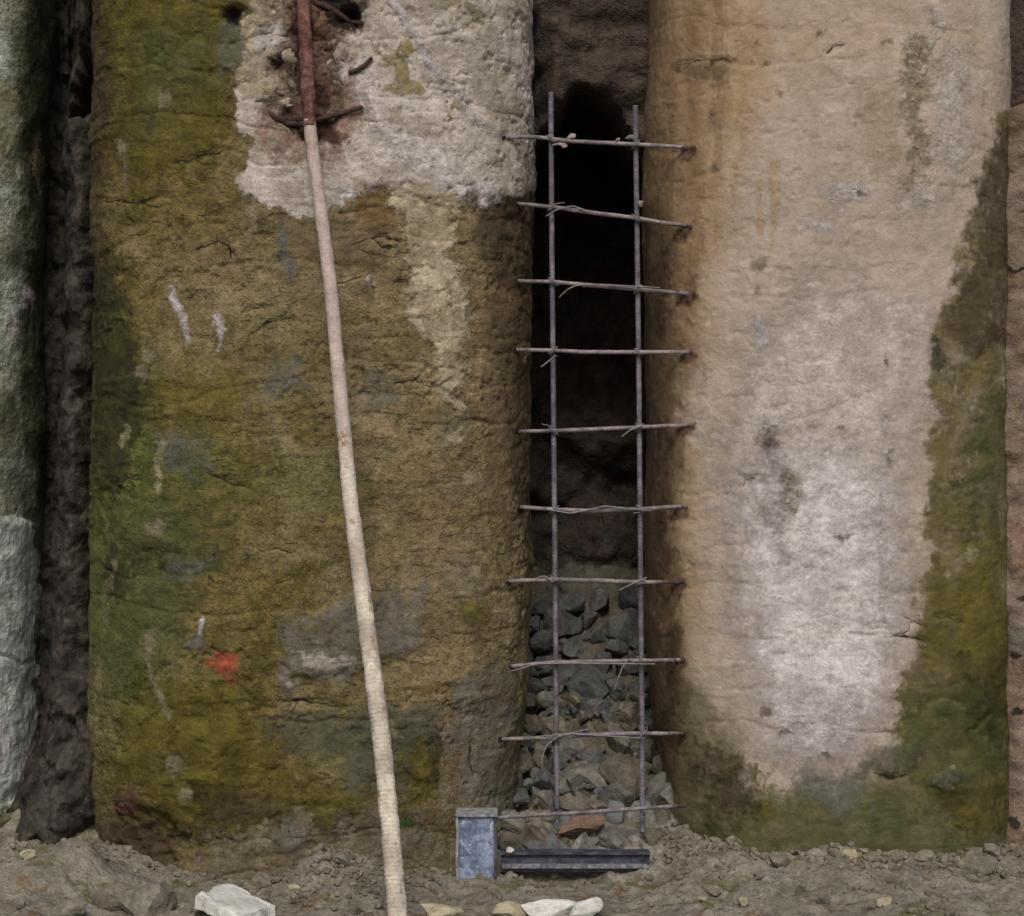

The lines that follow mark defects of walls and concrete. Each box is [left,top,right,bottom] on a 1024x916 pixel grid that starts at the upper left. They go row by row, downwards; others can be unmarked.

rust [297,0,316,129]
spalling [348,56,373,75]
spalling [267,110,303,127]
spalling [316,105,363,123]